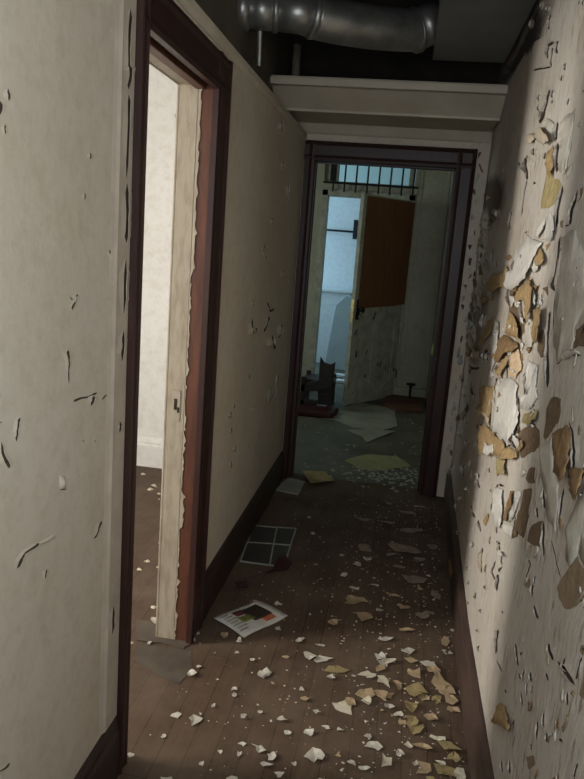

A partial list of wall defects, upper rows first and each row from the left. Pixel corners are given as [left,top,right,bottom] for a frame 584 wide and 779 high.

peeling [446,89,584,619]
crack [0,417,23,469]
crack [15,534,56,569]
peeling [491,703,515,731]
peeling [502,634,584,779]